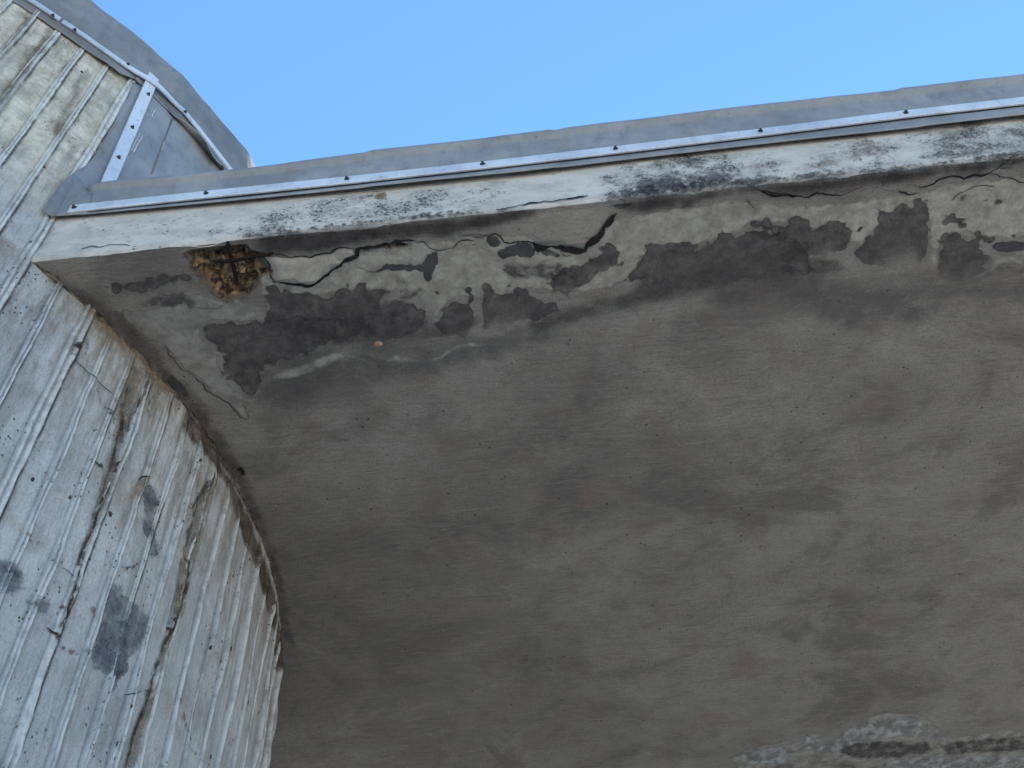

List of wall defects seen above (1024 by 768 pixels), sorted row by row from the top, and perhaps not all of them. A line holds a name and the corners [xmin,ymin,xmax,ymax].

damp [810,120,1024,174]
crack [743,153,1024,210]
spalling [182,241,430,303]
crack [263,195,617,288]
damp [112,148,1024,418]